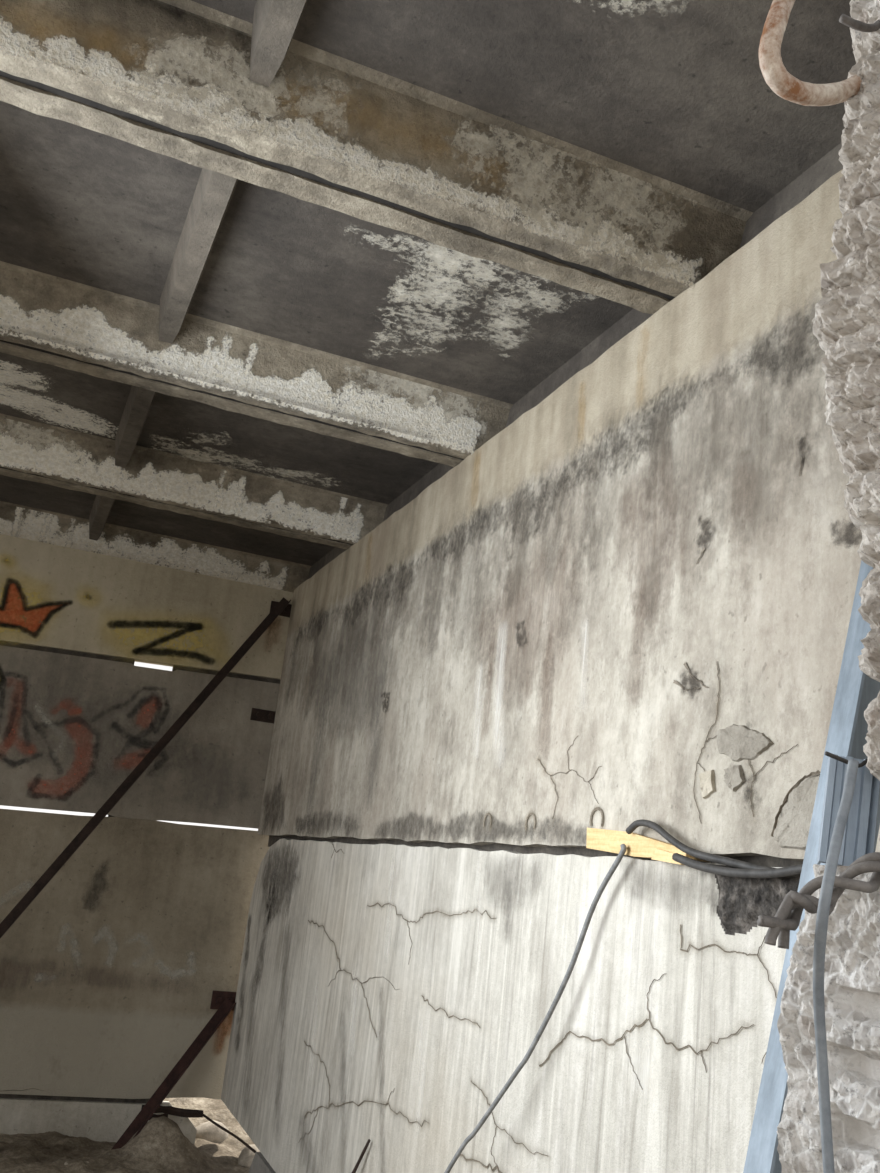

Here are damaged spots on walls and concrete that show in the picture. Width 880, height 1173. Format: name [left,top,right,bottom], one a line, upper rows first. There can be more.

leakage [601,0,671,12]
leakage [0,16,703,287]
leakage [354,229,594,357]
leakage [0,294,486,455]
leakage [0,360,364,542]
leakage [0,507,289,590]
leakage [382,815,586,842]
spalling [712,864,800,936]
crack [308,902,496,1037]
crack [539,924,777,1090]
crack [298,1040,428,1143]
crack [460,1081,548,1173]